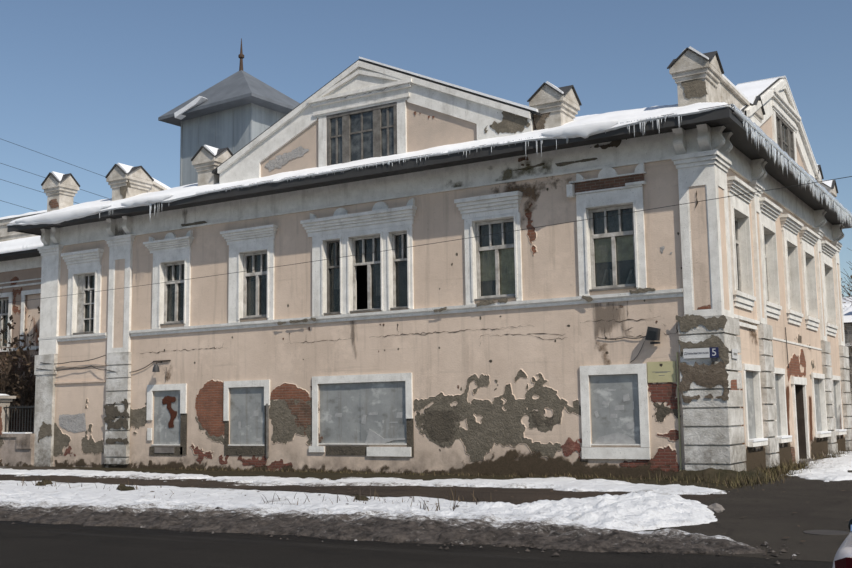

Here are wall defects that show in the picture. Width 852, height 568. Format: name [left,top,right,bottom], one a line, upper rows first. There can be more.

flaking render [681,79,708,99]
flaking render [484,111,550,134]
flaking render [524,203,537,256]
crack [372,324,564,344]
water stain [595,303,624,336]
crack [586,301,678,340]
flaking render [786,333,816,383]
flaking render [0,346,147,457]
flaking render [149,379,369,471]
flaking render [406,368,582,462]
flaking render [619,305,738,472]